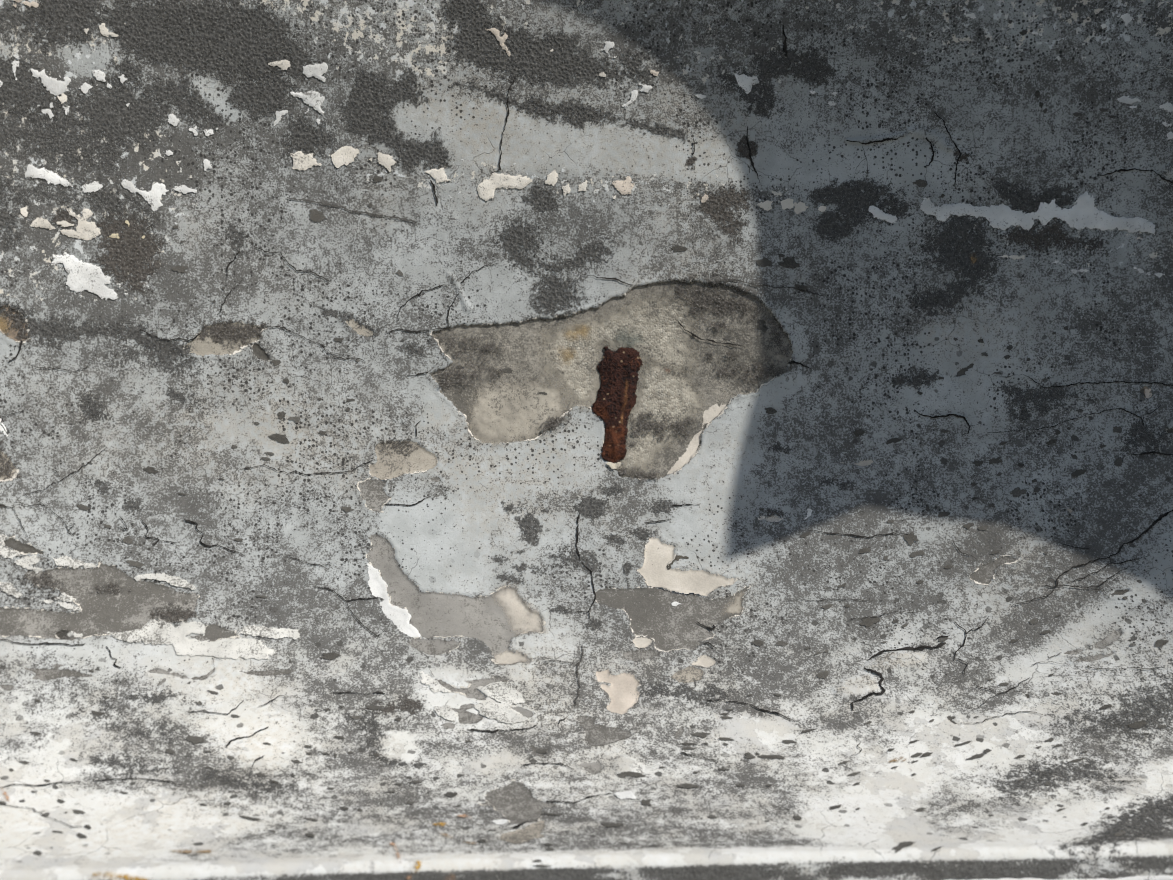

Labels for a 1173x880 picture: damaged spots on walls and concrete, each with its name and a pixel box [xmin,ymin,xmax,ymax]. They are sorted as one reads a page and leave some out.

damp [0,0,456,301]
crack [386,263,497,333]
crack [490,75,516,174]
peeling [477,170,588,201]
peeling [429,267,794,481]
corrosion [592,346,643,469]
peeling [913,179,1155,235]
peeling [366,534,546,742]
crack [471,513,596,732]
peeling [576,536,751,749]
crack [809,530,908,538]
crack [851,510,1173,755]